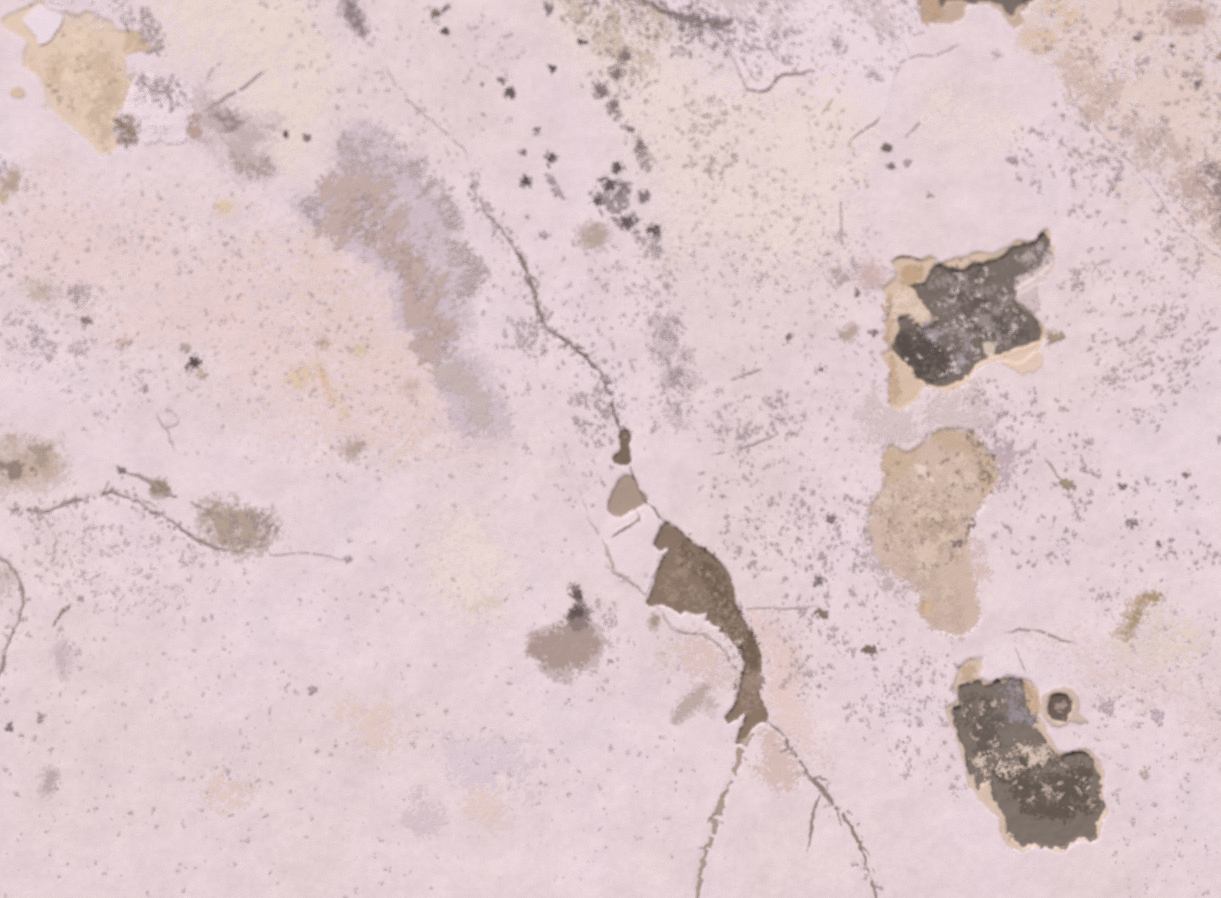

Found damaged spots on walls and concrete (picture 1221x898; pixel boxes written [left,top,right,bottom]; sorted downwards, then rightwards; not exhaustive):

peeling [1,0,195,155]
crack [640,0,812,92]
peeling [650,0,1034,141]
crack [386,67,631,432]
leakage [0,0,1221,705]
spalling [881,229,1055,411]
crack [0,557,25,674]
crack [9,472,351,562]
crack [563,444,736,670]
peeling [864,426,1002,640]
crack [696,720,877,898]
spalling [946,657,1108,852]